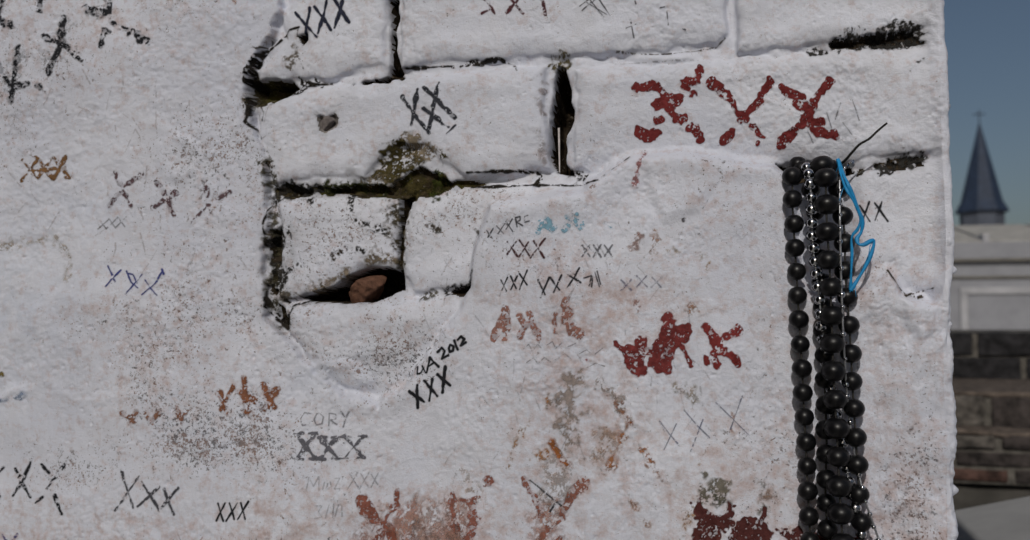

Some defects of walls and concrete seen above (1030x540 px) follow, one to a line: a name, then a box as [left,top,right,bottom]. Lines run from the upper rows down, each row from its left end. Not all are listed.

mould [806,19,925,56]
damp [401,132,450,203]
damp [853,151,928,176]
damp [272,175,402,238]
spalling [250,0,944,401]
damp [268,230,291,249]
damp [356,246,403,266]
damp [270,249,358,327]
damp [420,270,472,300]